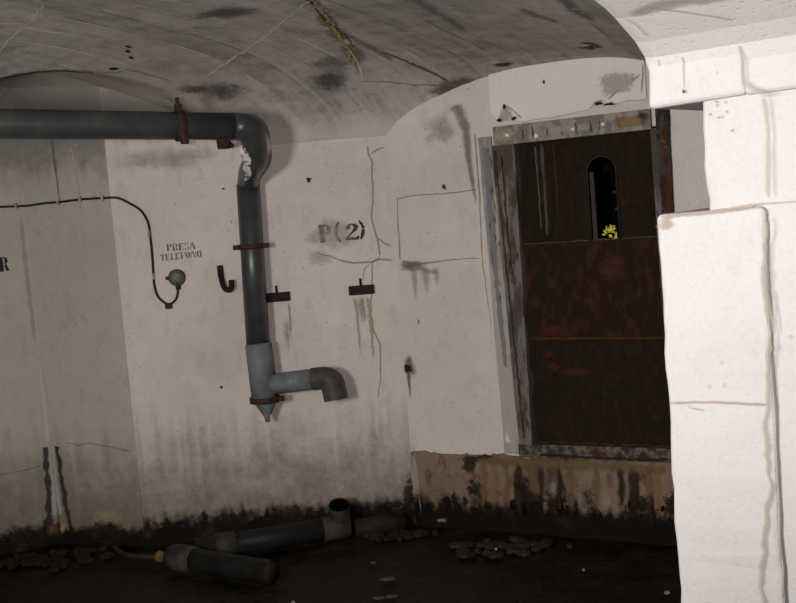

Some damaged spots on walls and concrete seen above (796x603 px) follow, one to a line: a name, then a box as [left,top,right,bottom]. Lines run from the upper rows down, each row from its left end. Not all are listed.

crack [206,0,470,86]
corrosion [612,113,646,127]
crack [316,136,491,397]
corrosion [494,151,525,438]
water stain [0,361,334,555]
water stain [344,455,677,546]
corrosion [477,451,669,518]